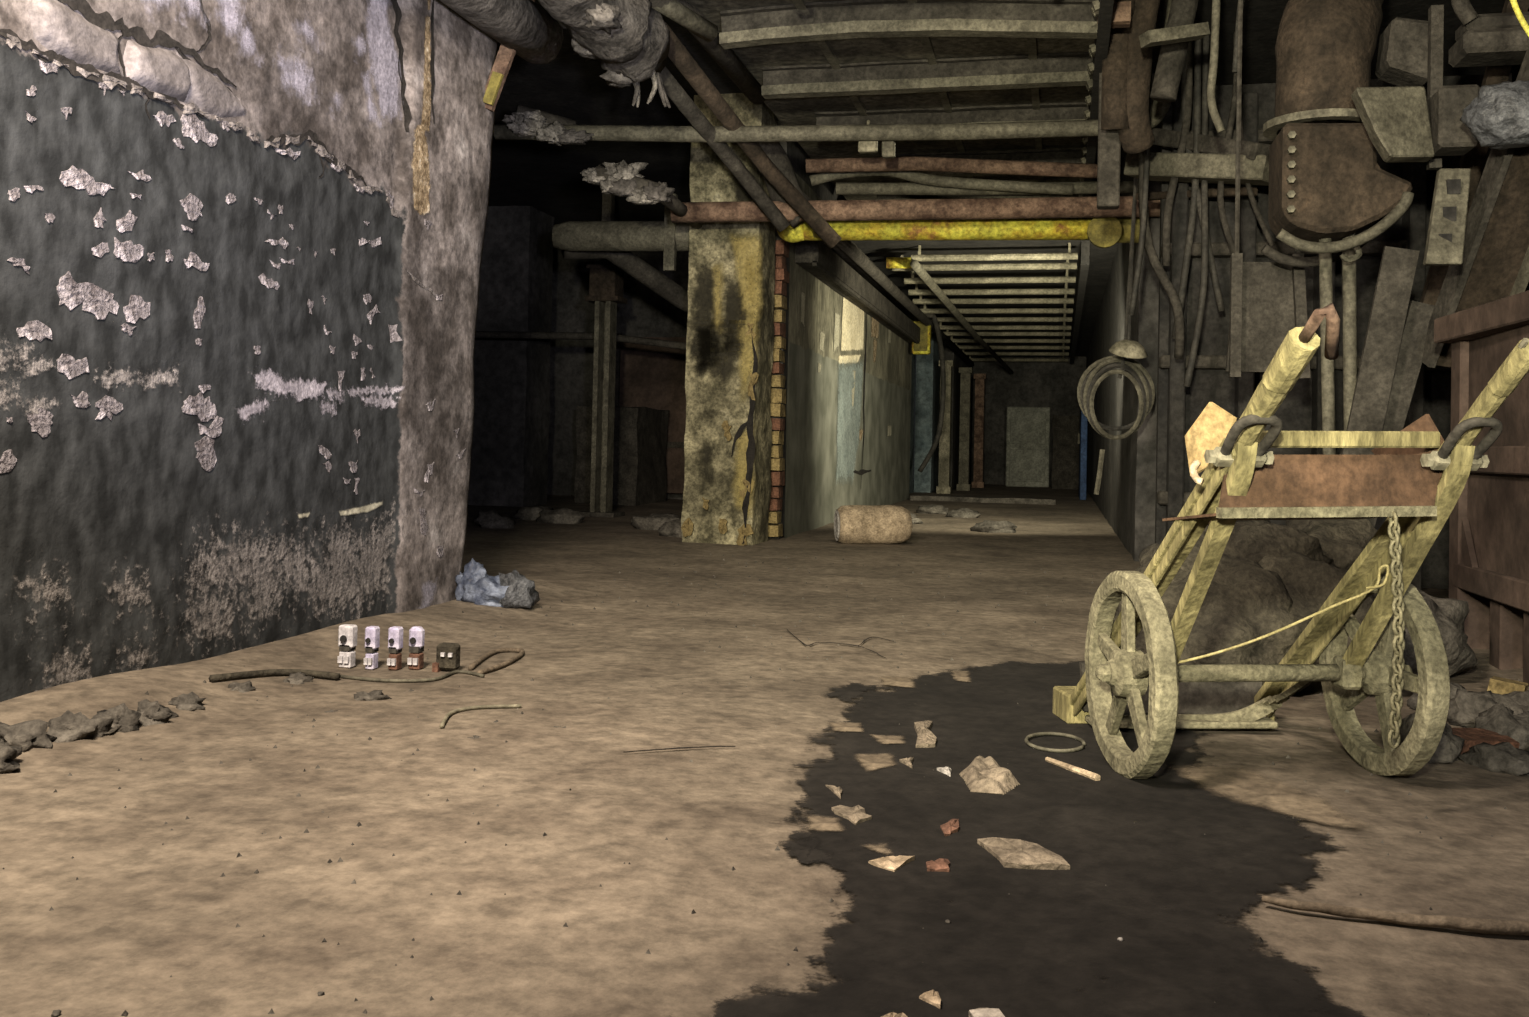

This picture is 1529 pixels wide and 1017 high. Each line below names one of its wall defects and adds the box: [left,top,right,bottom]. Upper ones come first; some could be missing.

crack [0,0,237,120]
damp [356,0,399,125]
peeling [59,165,210,271]
peeling [254,198,336,290]
peeling [16,320,123,421]
peeling [56,271,151,336]
damp [94,369,178,390]
peeling [182,384,224,472]
damp [239,369,404,419]
peeling [307,293,403,392]
damp [691,236,760,388]
damp [185,501,406,651]